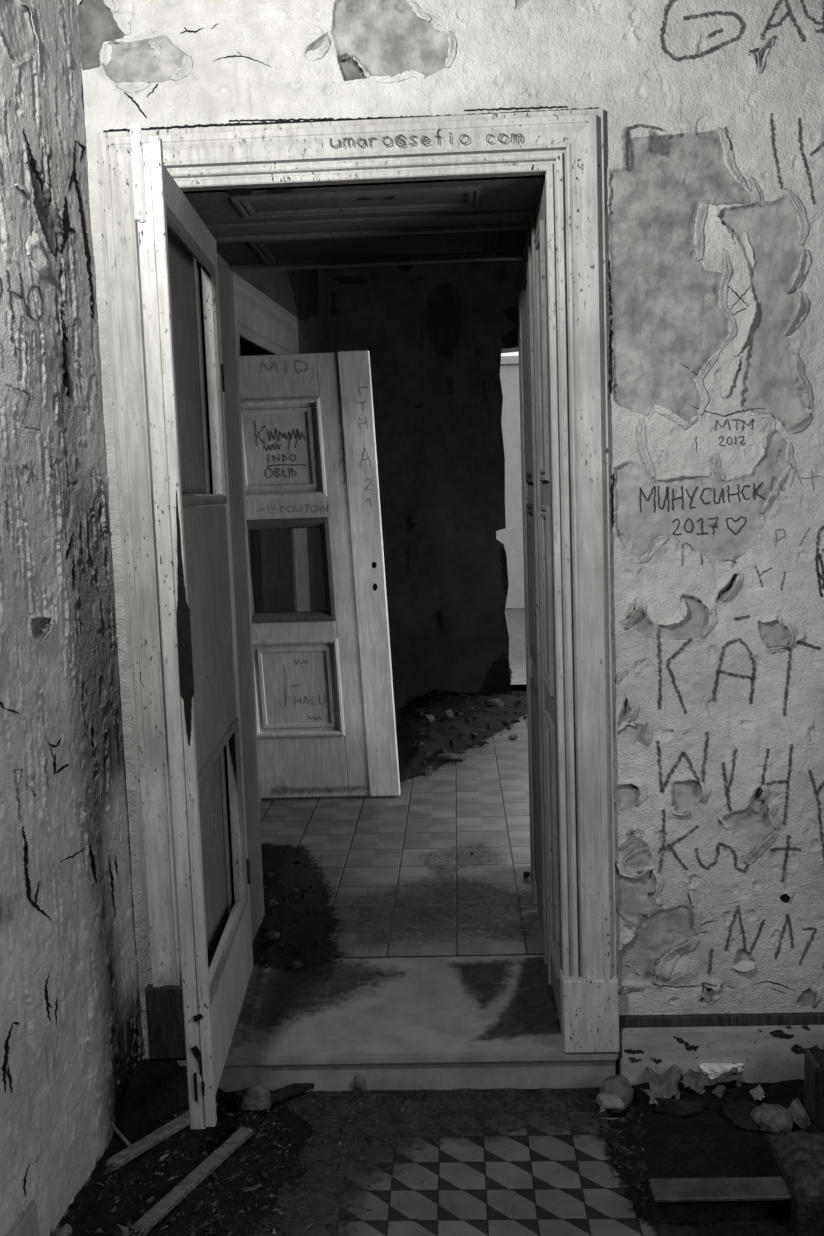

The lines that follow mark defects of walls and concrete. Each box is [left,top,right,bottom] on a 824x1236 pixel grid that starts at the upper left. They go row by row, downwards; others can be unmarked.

peeling [76,0,193,93]
peeling [303,0,457,83]
peeling [609,128,814,640]
peeling [757,615,805,653]
peeling [616,670,653,746]
peeling [617,783,648,810]
peeling [671,780,711,820]
peeling [718,785,781,865]
peeling [616,828,702,994]
peeling [702,980,724,1002]
peeling [733,949,757,972]